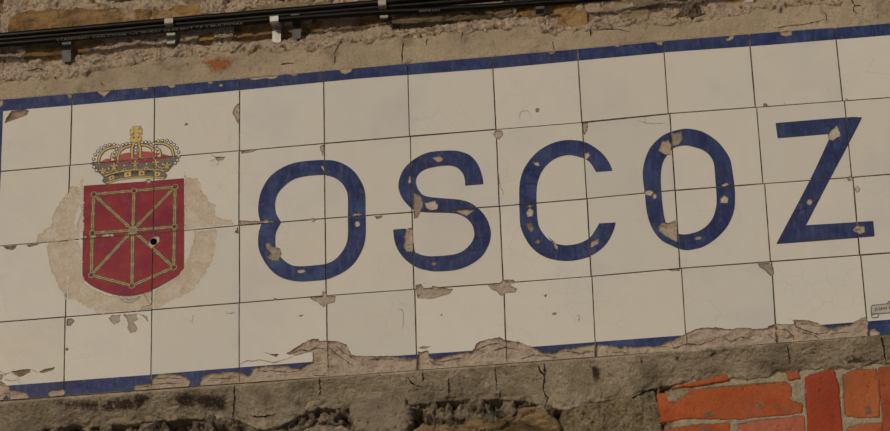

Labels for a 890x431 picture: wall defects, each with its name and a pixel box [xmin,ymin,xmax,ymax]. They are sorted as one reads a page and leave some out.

peeling [758,263,774,276]
peeling [415,284,453,299]
peeling [488,280,517,296]
spalling [133,317,880,391]
spalling [0,367,55,401]
crack [480,368,540,431]
crack [538,364,548,403]